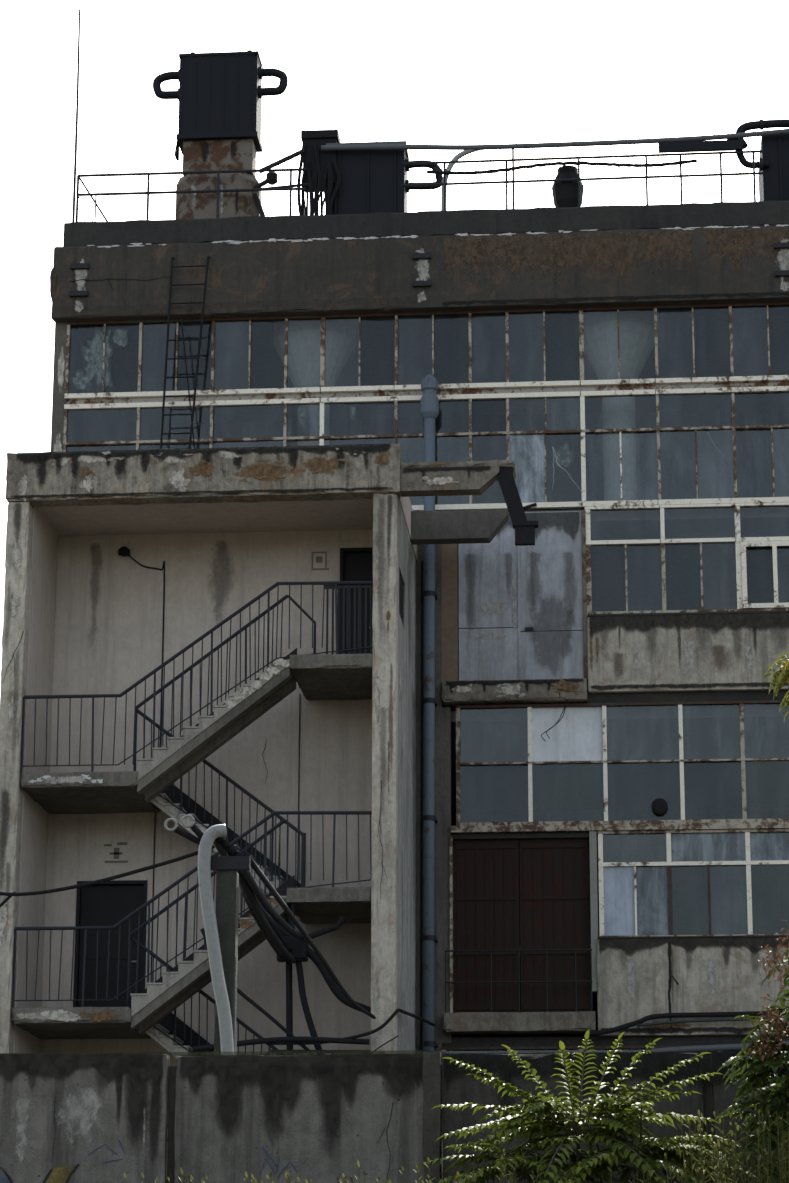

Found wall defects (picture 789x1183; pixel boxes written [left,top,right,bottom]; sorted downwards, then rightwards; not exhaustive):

spalling [69,259,89,312]
spalling [660,224,789,291]
spalling [18,475,27,501]
spalling [52,434,125,492]
spalling [151,453,196,492]
spalling [218,450,243,459]
damp [525,512,579,538]
damp [446,613,789,693]
damp [599,937,789,997]
damp [0,1053,163,1161]
damp [180,1054,423,1149]